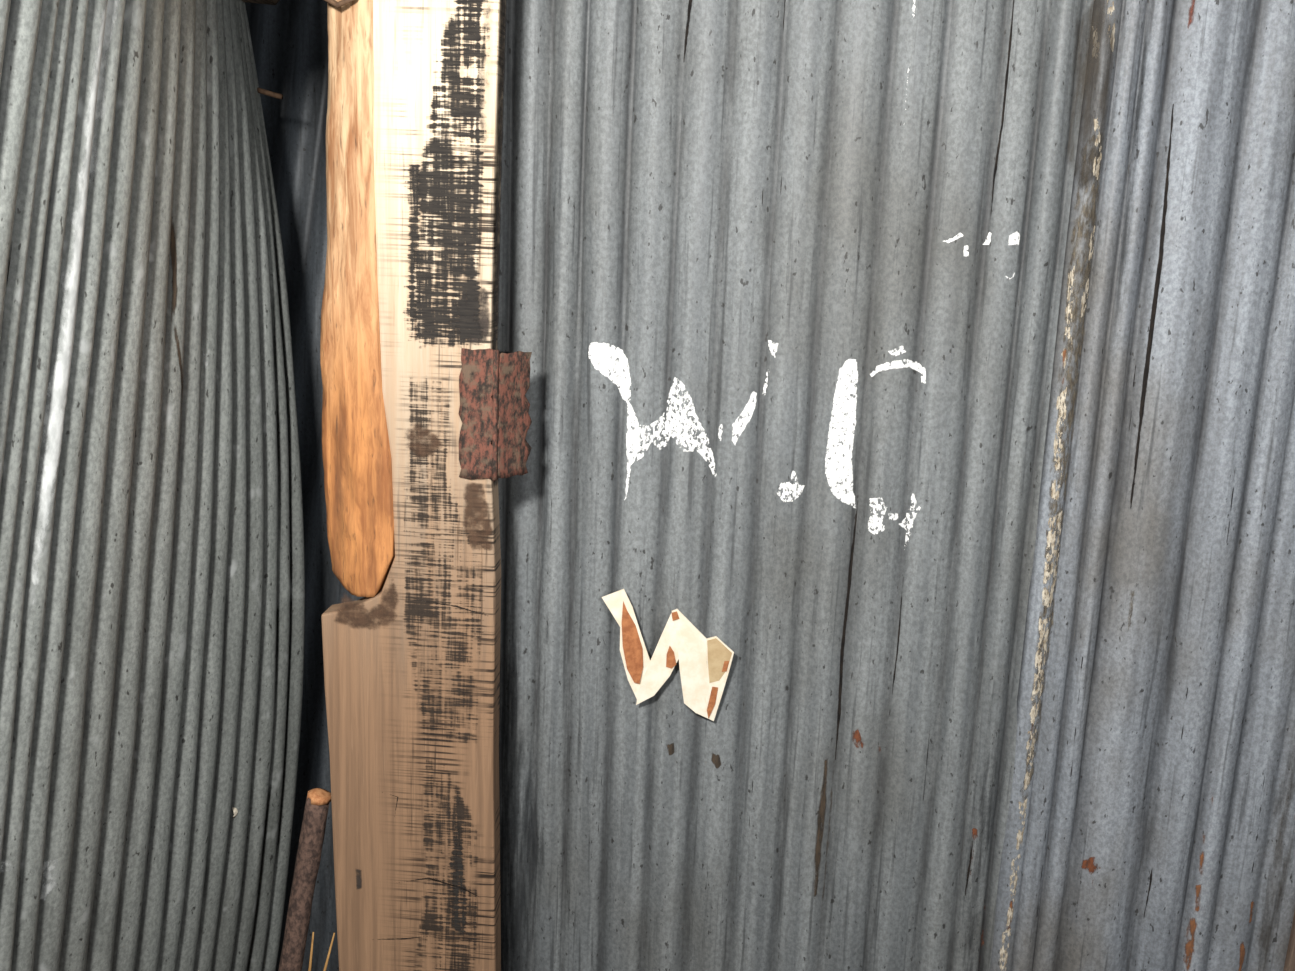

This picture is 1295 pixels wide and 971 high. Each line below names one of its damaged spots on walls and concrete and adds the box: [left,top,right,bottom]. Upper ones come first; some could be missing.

peeling [635,377,723,476]
peeling [868,497,898,535]
corrosion [1081,857,1100,883]
corrosion [1184,836,1204,970]